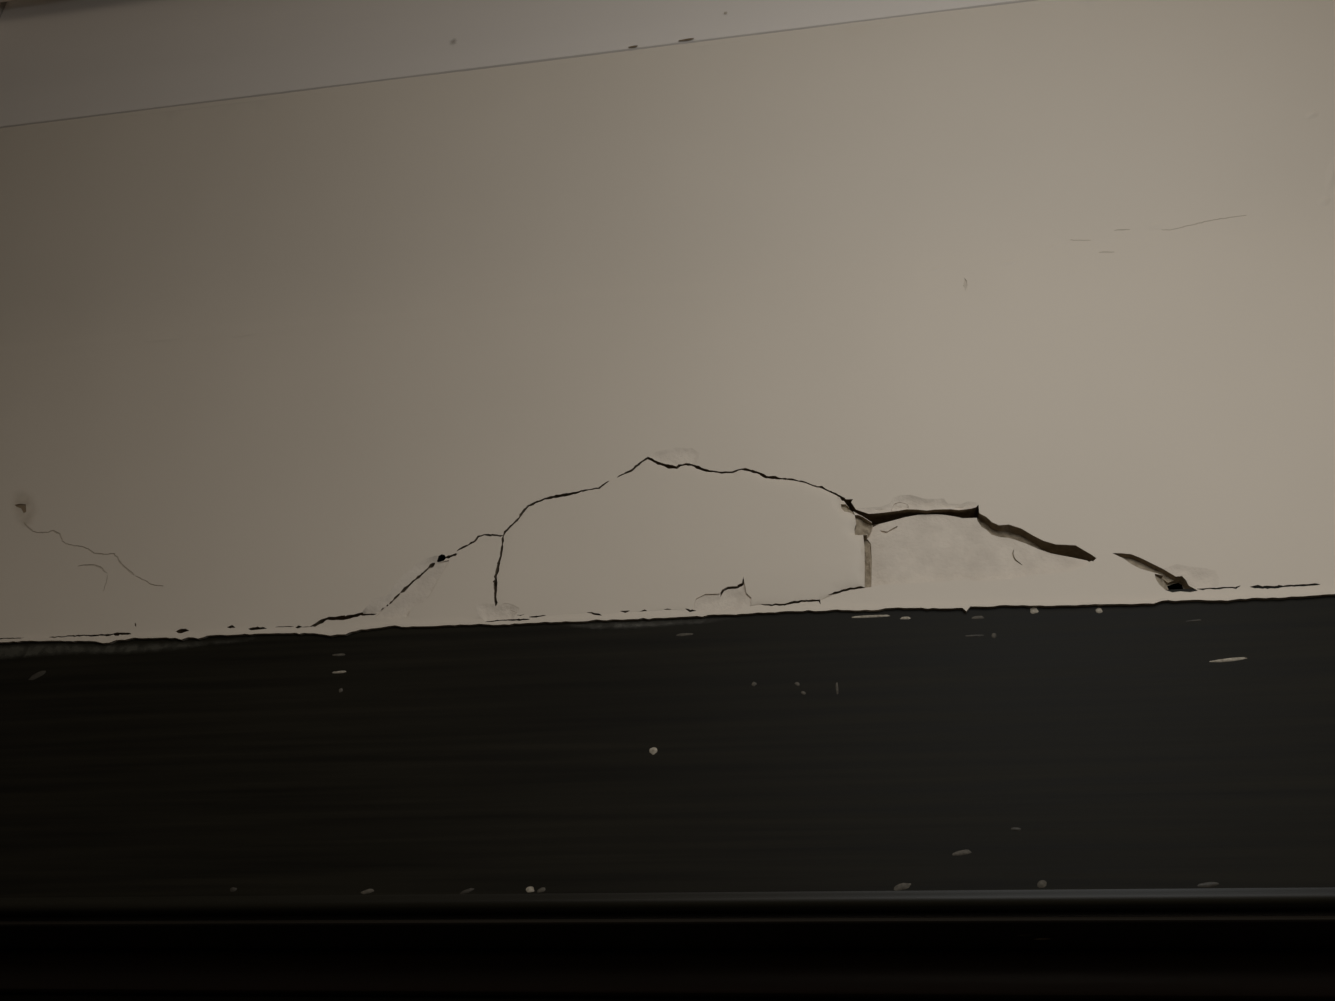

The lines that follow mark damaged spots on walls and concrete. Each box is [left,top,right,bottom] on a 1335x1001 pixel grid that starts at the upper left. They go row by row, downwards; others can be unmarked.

crack [227,457,1320,630]
crack [52,623,136,638]